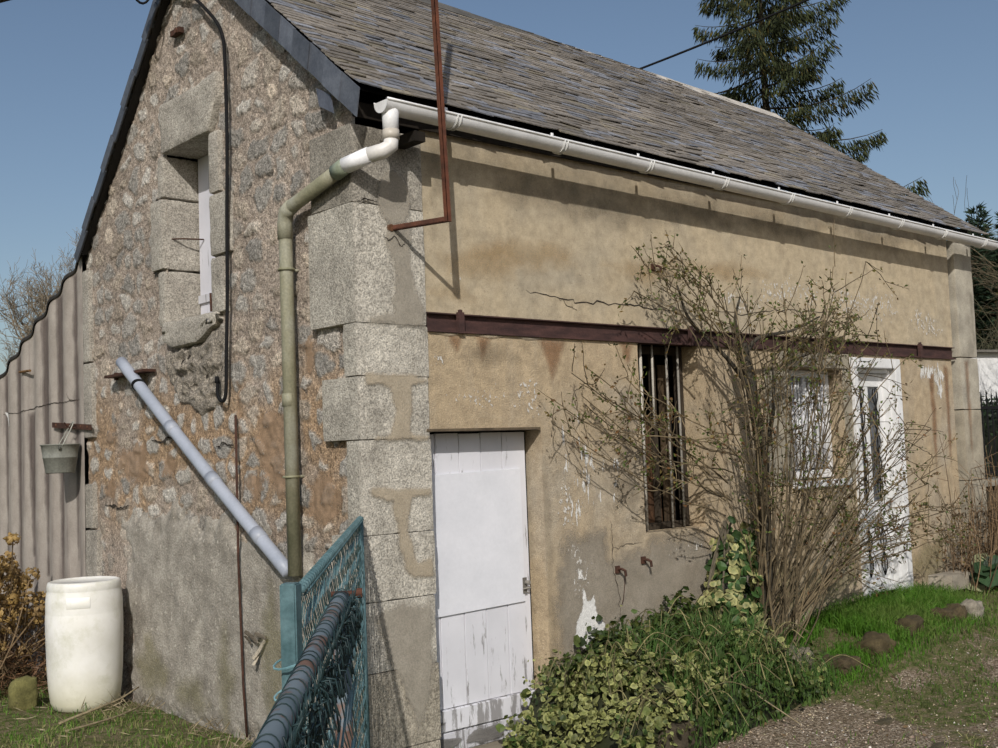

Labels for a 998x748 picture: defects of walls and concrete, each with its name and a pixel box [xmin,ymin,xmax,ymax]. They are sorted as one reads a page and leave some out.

crack [529,292,842,316]
crack [3,398,80,415]
peeling [569,437,619,525]
peeling [573,568,605,648]